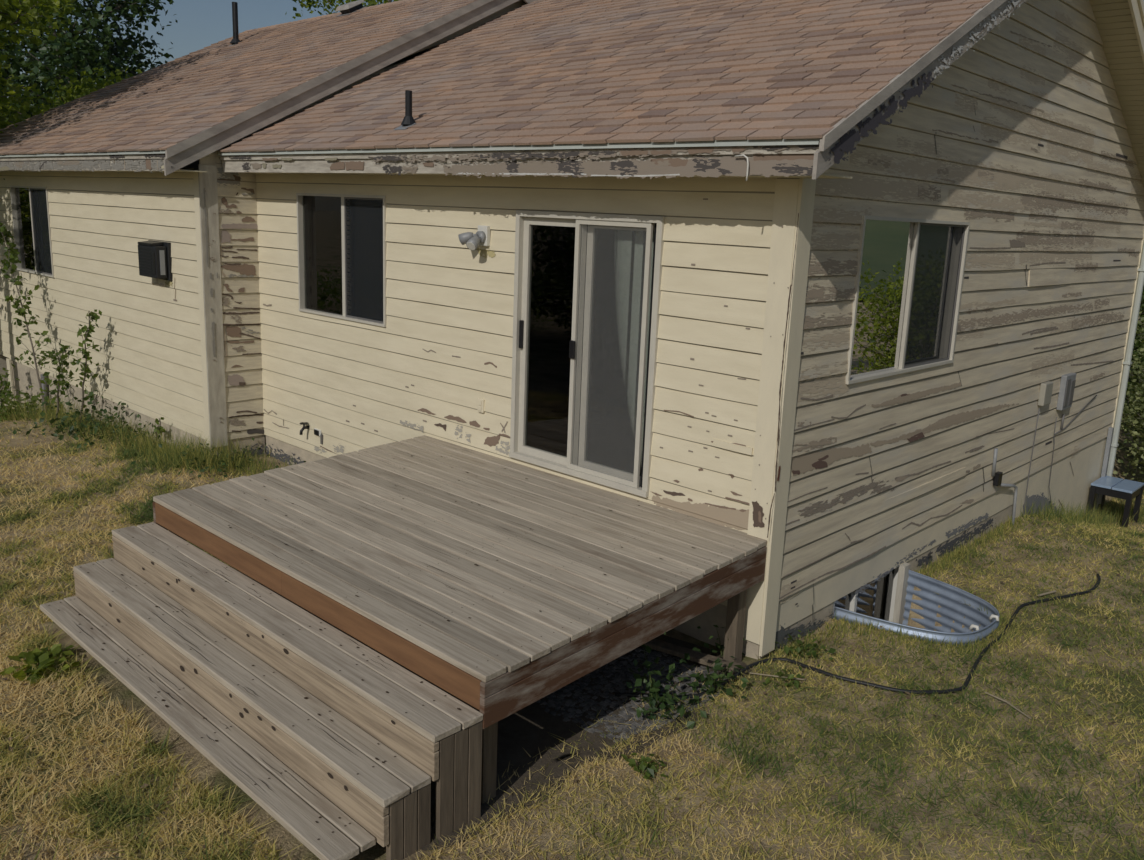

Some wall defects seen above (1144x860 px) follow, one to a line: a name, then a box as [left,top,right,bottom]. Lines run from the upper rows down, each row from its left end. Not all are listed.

peeling [330,145,819,179]
peeling [204,168,260,357]
peeling [400,408,510,455]
peeling [650,474,761,530]